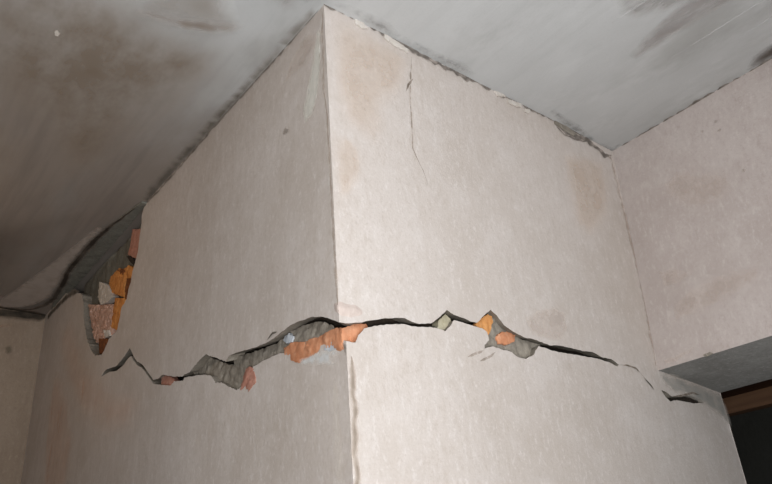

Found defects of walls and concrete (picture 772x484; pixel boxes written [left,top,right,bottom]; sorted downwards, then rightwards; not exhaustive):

leakage [7,18,189,154]
crack [0,4,772,321]
leakage [0,229,100,307]
flaking render [84,225,141,354]
crack [161,314,587,484]
crack [624,322,728,420]